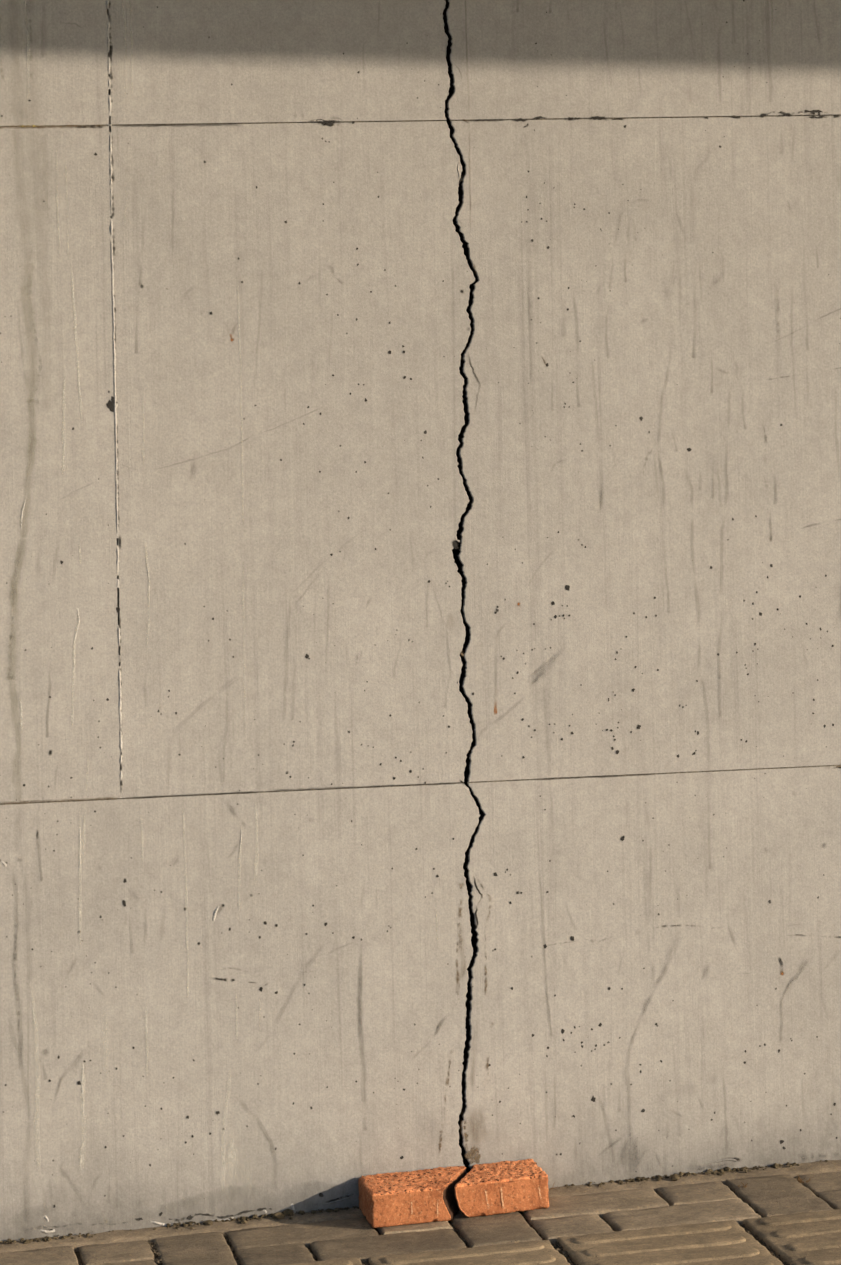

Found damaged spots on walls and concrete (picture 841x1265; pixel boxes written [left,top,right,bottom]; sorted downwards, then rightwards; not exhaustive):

crack [443,0,485,1173]